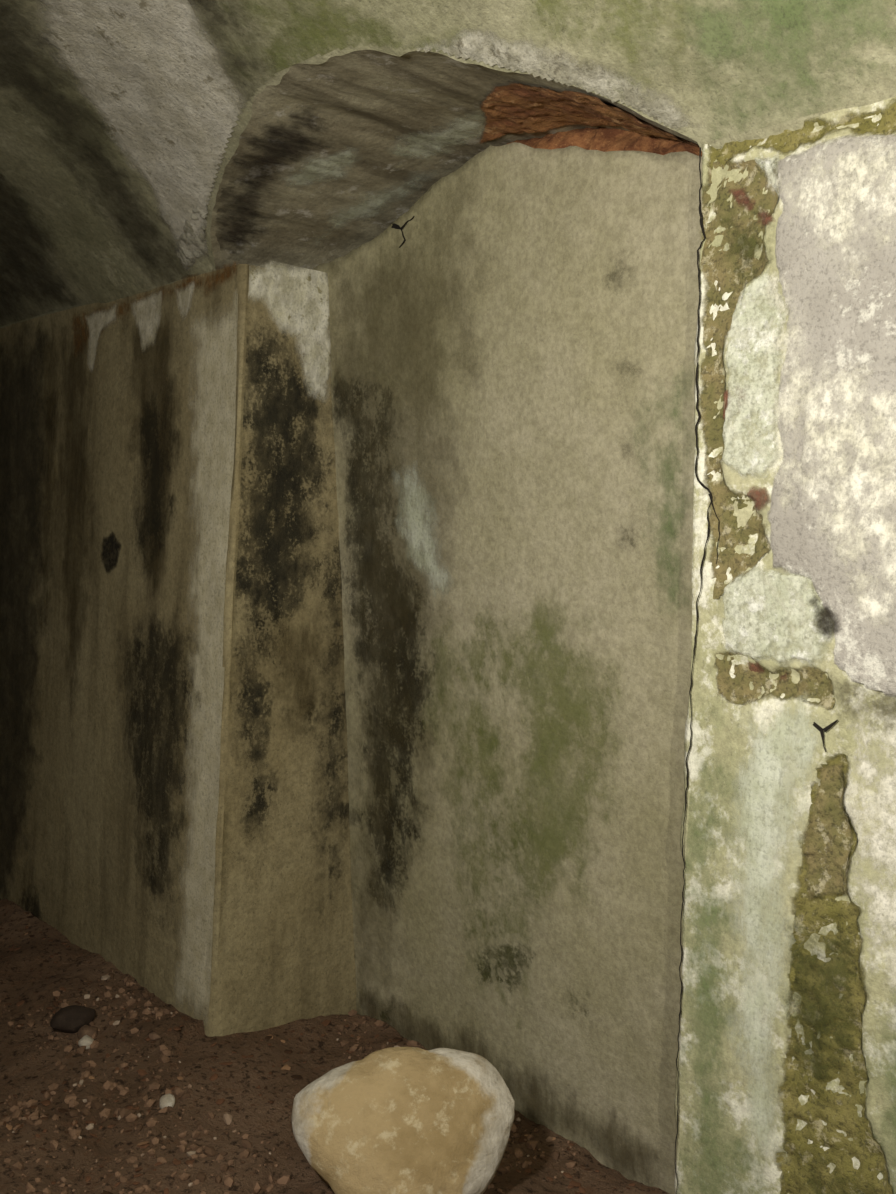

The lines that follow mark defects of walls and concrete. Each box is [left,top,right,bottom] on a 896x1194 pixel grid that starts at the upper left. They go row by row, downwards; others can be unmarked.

water stain [126,263,447,1013]
crack [675,148,720,1194]
crack [813,720,838,752]
spalling [774,753,893,1194]